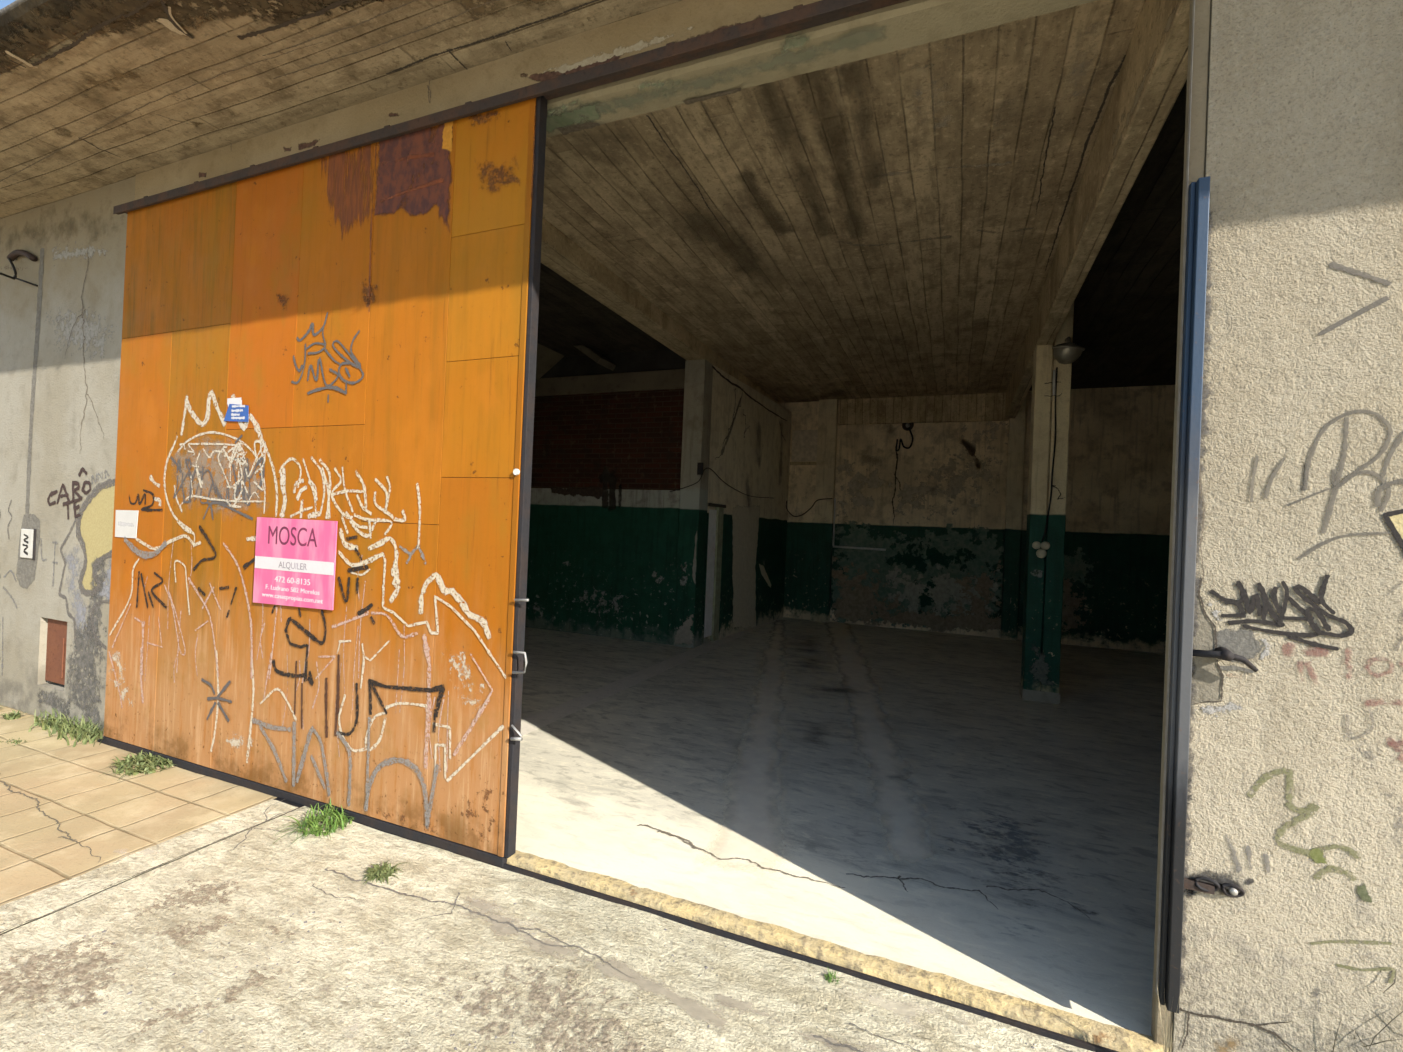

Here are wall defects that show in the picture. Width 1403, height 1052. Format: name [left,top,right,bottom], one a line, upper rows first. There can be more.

damp [83,70,140,90]
damp [0,0,382,74]
corrosion [479,106,536,198]
damp [801,70,862,237]
damp [741,173,786,232]
peeling [830,520,1004,633]
spalling [1191,457,1270,717]
crack [0,773,308,933]
crack [637,824,1089,918]
crack [1179,1008,1293,1052]